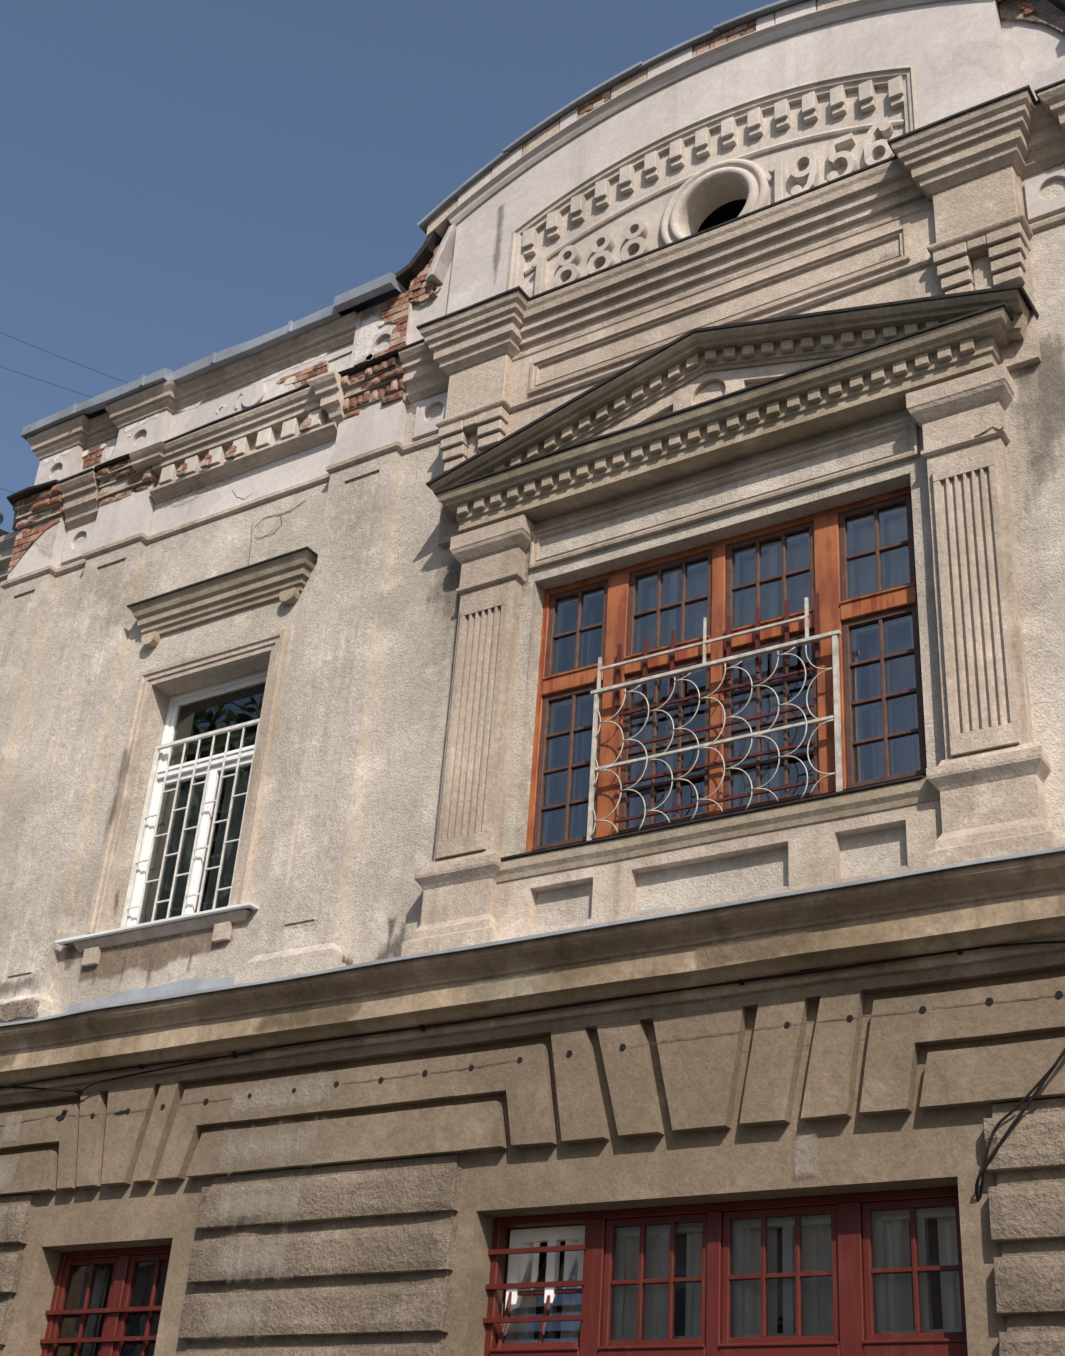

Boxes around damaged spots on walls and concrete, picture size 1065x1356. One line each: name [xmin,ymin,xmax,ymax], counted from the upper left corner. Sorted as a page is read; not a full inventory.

flaking render [253,244,441,433]
flaking render [42,413,166,507]
flaking render [176,445,237,478]
flaking render [6,479,65,574]